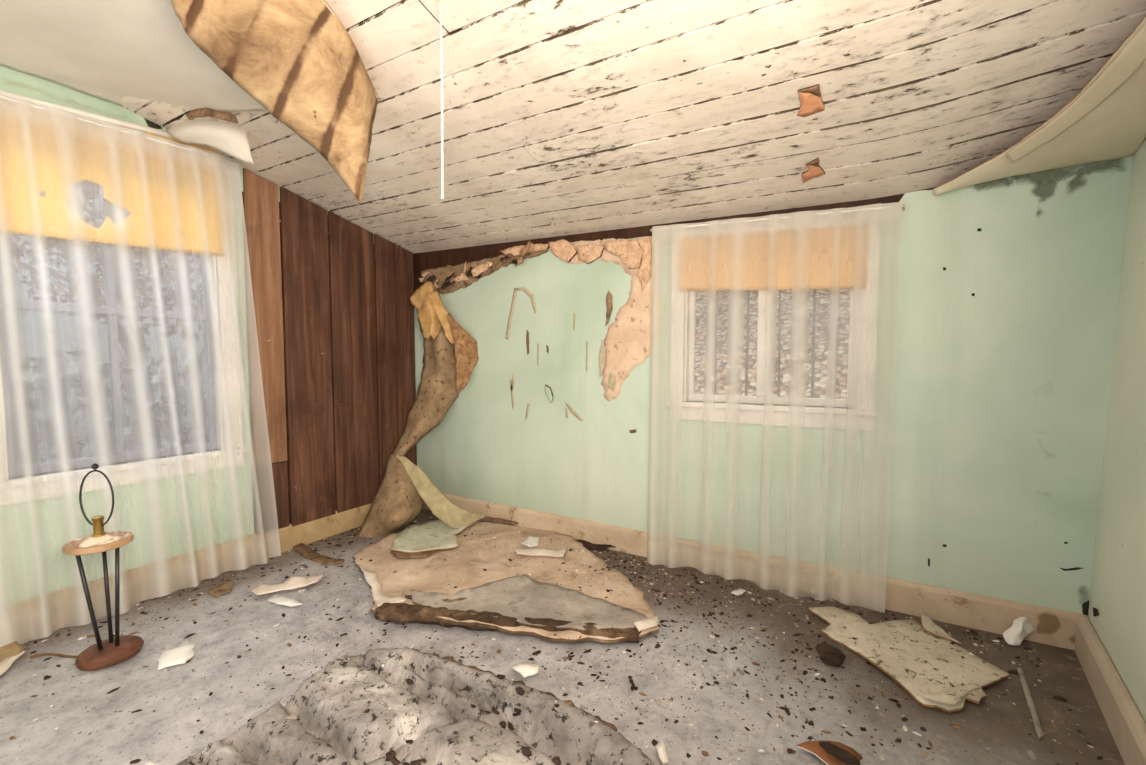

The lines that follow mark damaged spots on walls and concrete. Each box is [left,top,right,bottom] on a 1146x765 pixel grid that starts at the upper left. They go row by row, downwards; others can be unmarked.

peeling [797,84,825,117]
peeling [144,108,254,164]
peeling [801,157,825,183]
damp [975,159,1121,215]
spalling [419,237,662,402]
peeling [510,375,530,421]
peeling [544,384,583,421]